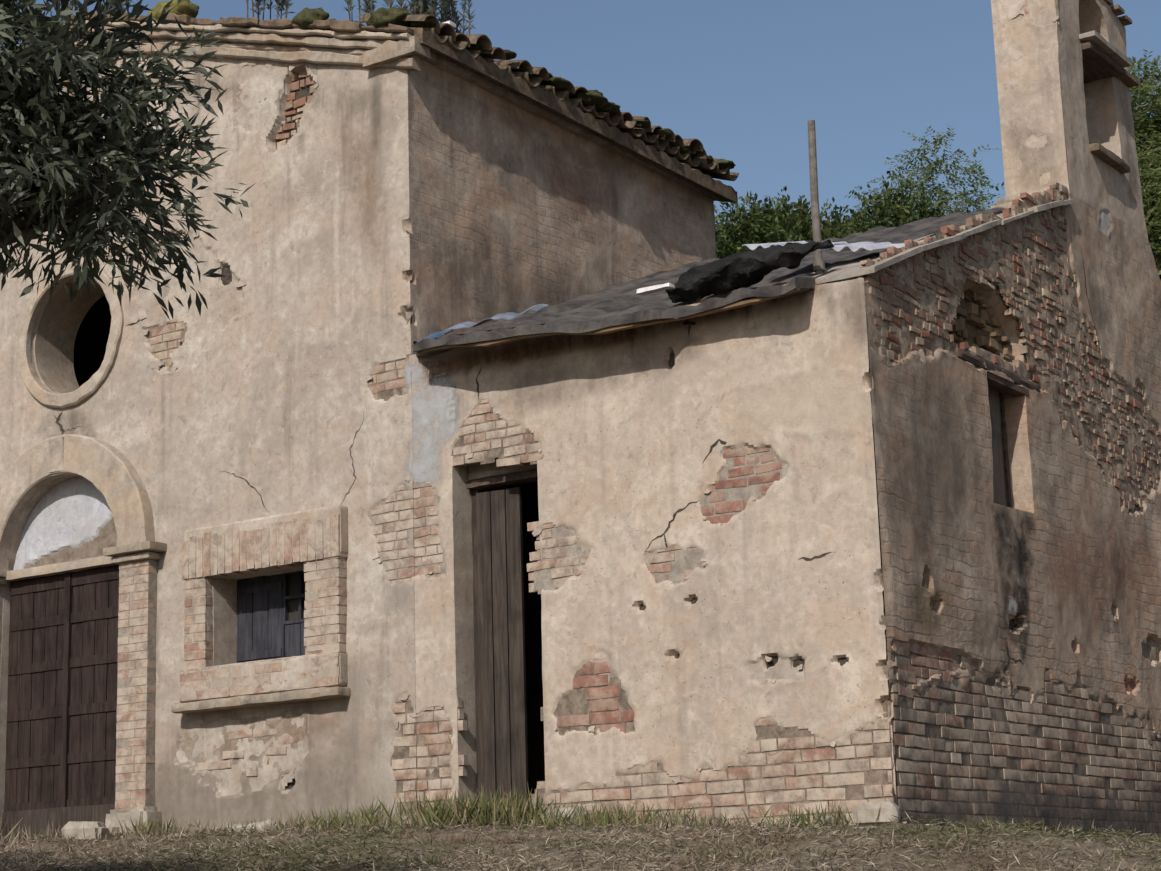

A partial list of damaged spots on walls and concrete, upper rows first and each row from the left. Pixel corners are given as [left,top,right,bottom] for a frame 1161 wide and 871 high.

peeling [233,62,319,150]
peeling [126,232,246,374]
flaking render [860,182,1161,513]
flaking render [367,476,447,584]
flaking render [450,399,544,468]
flaking render [527,521,591,594]
crack [645,501,698,552]
crack [703,439,732,462]
flaking render [699,446,789,525]
leakage [996,512,1033,657]
flaking render [390,692,468,818]
flaking render [531,612,1161,840]